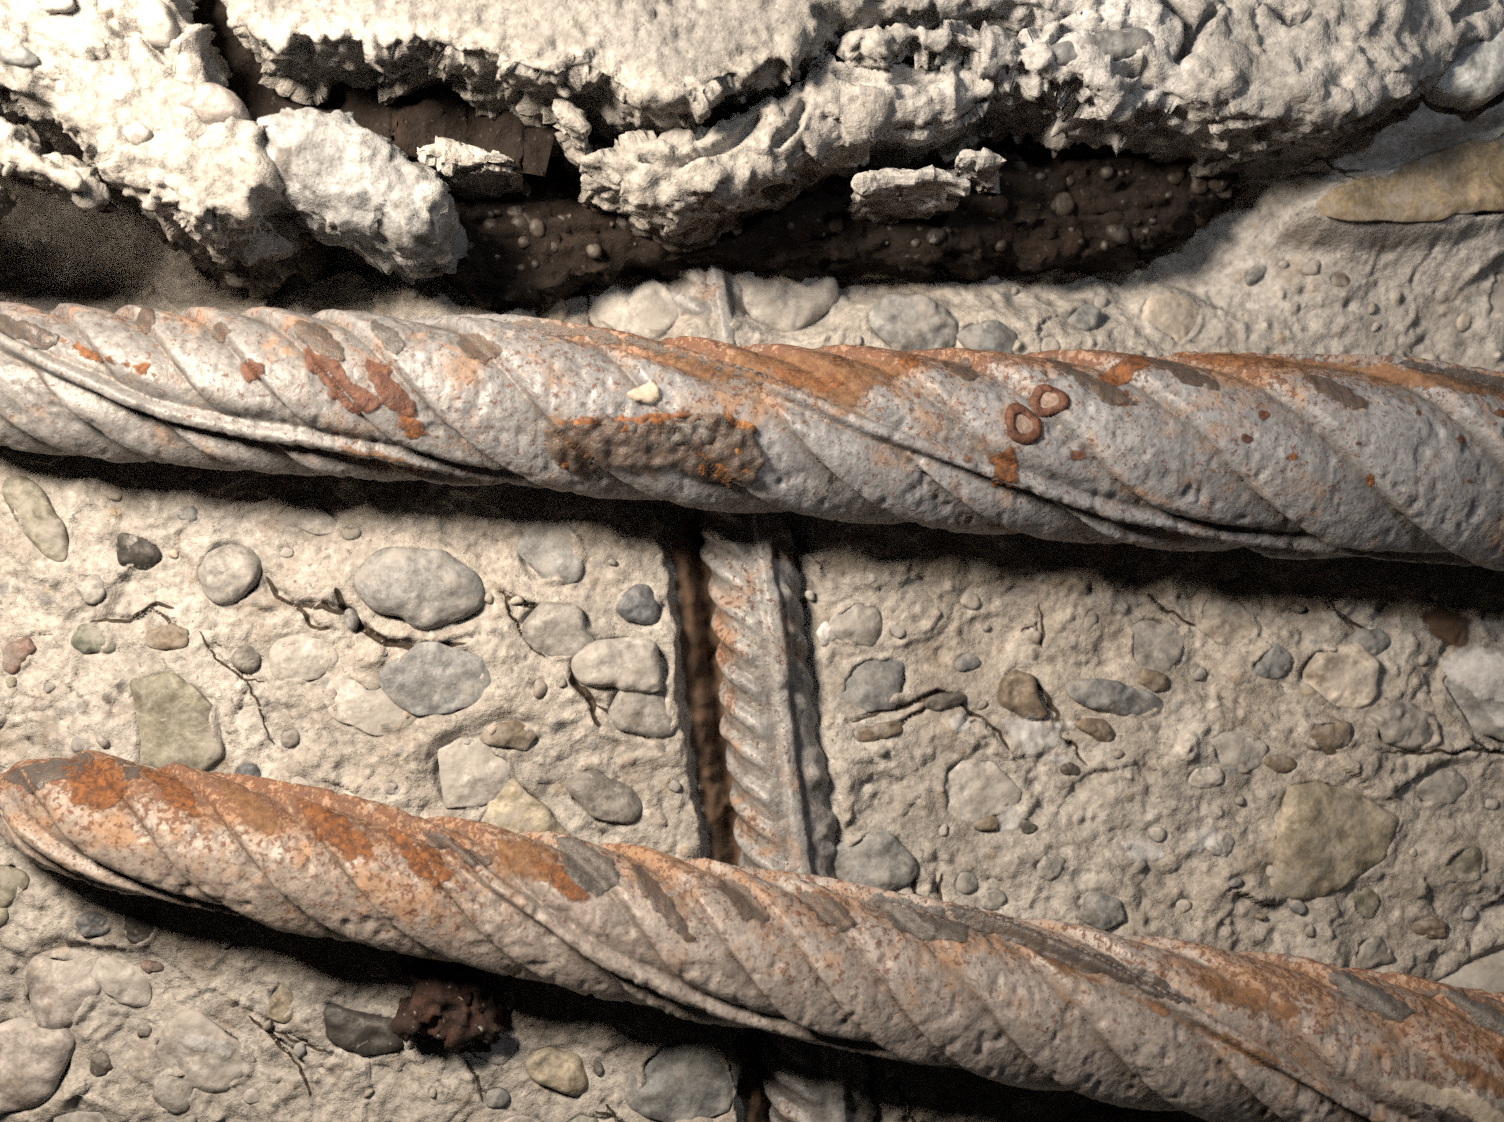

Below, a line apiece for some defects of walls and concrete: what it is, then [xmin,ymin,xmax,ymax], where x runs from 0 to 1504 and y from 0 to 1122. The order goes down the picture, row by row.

spalling [0,107,119,221]
crack [1301,157,1362,179]
peeling [0,314,59,349]
rust [303,347,439,439]
rust [544,382,766,490]
rust [962,384,1070,489]
peeling [1144,357,1218,390]
rust [672,519,741,866]
rust [4,752,200,817]
peeling [554,834,695,941]
peeling [718,879,768,923]
peeling [871,893,1196,1004]